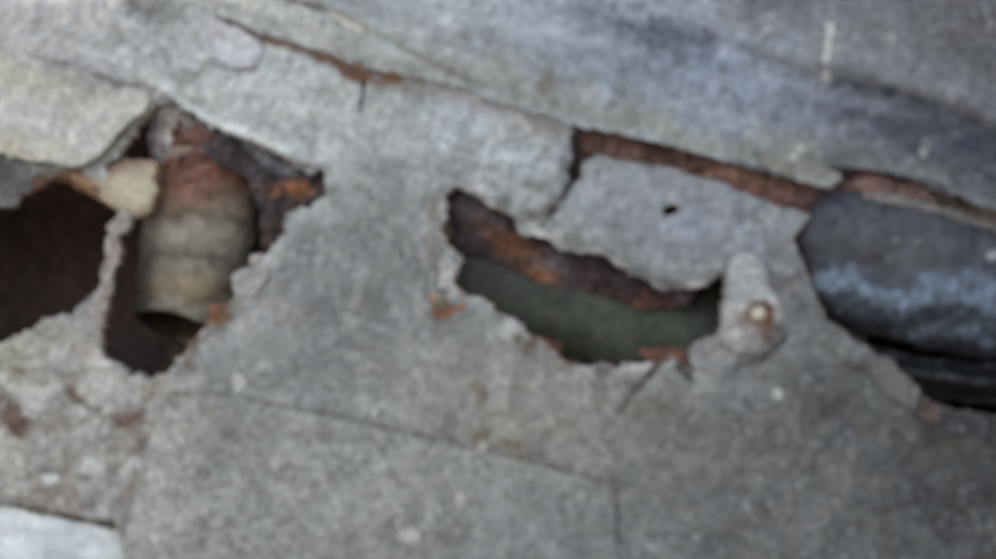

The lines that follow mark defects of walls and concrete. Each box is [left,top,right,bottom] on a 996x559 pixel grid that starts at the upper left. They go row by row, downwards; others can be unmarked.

corrosion [245,30,423,85]
crack [358,80,366,112]
peeling [0,51,326,381]
crack [546,133,582,221]
spalling [430,187,737,379]
corrosion [753,300,774,328]
spalling [793,215,996,424]